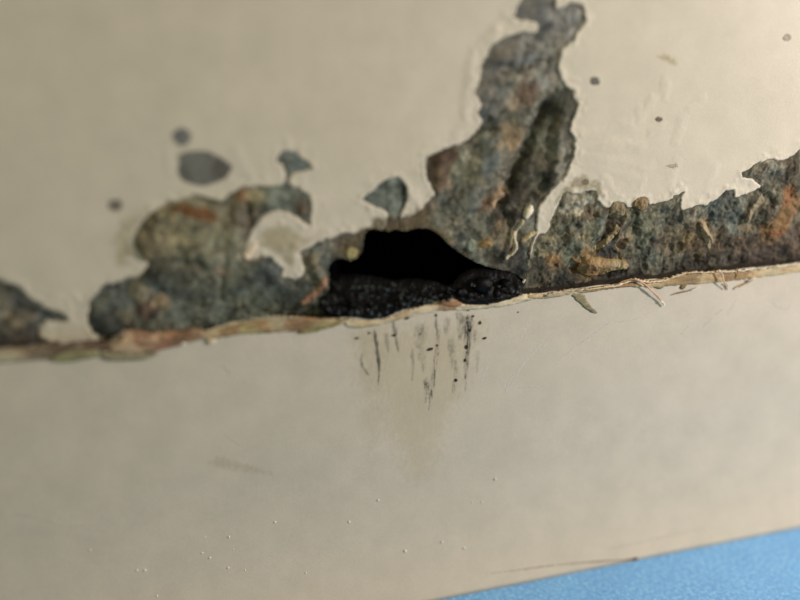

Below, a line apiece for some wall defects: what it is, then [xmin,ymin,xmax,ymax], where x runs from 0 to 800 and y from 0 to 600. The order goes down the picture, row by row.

spalling [0,0,800,363]
corrosion [430,151,457,165]
leakage [339,211,452,258]